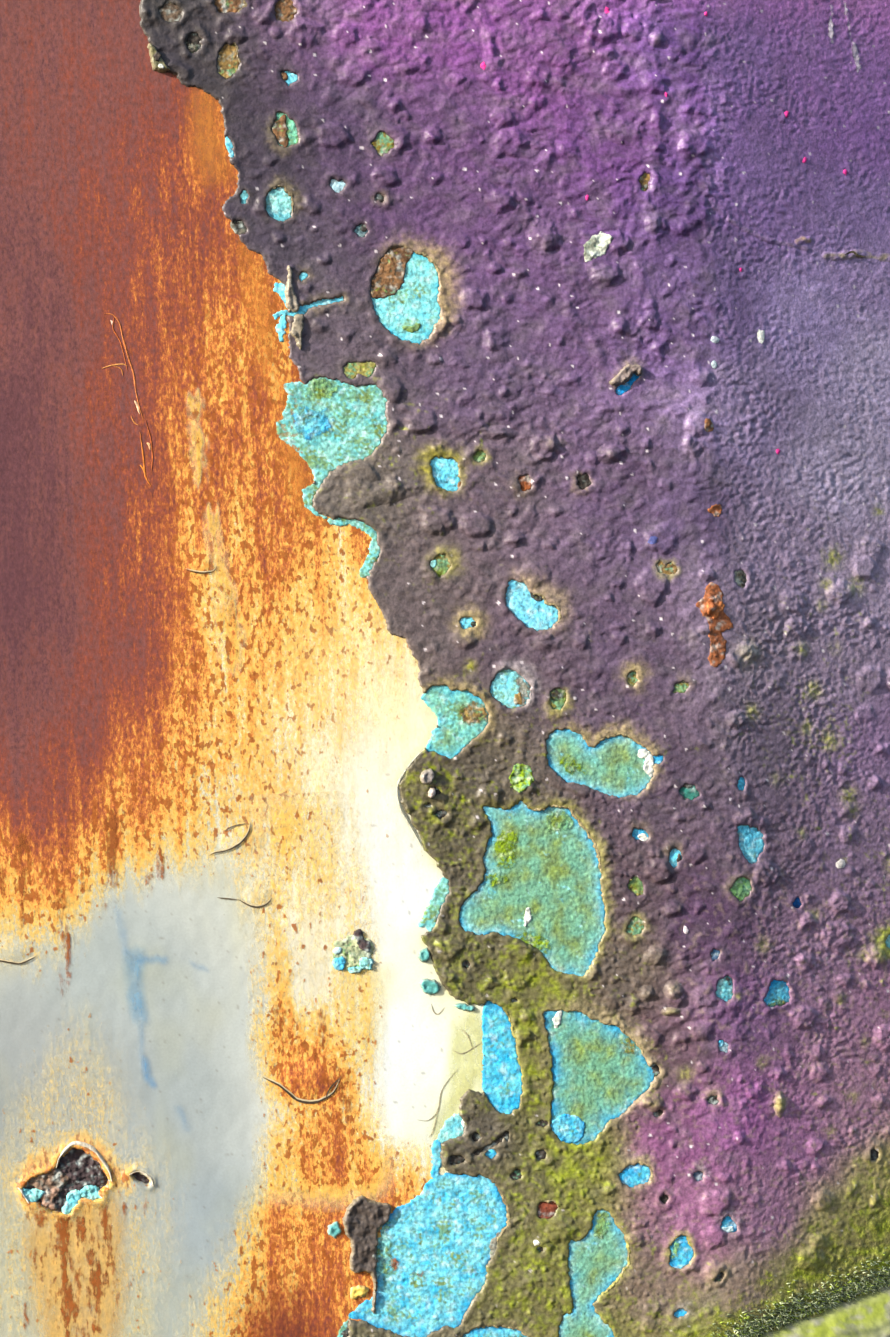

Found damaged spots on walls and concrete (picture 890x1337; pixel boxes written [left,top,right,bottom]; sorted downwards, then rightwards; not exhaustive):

peeling [370,247,414,299]
peeling [276,377,388,578]
rust [0,0,433,1337]
peeling [421,685,489,759]
peeling [546,729,654,798]
rust [696,582,733,667]
peeling [459,800,606,976]
peeling [454,999,523,1114]
peeling [536,1010,660,1145]
hole [18,1141,112,1214]
peeling [327,1113,528,1337]
peeling [559,1209,631,1337]